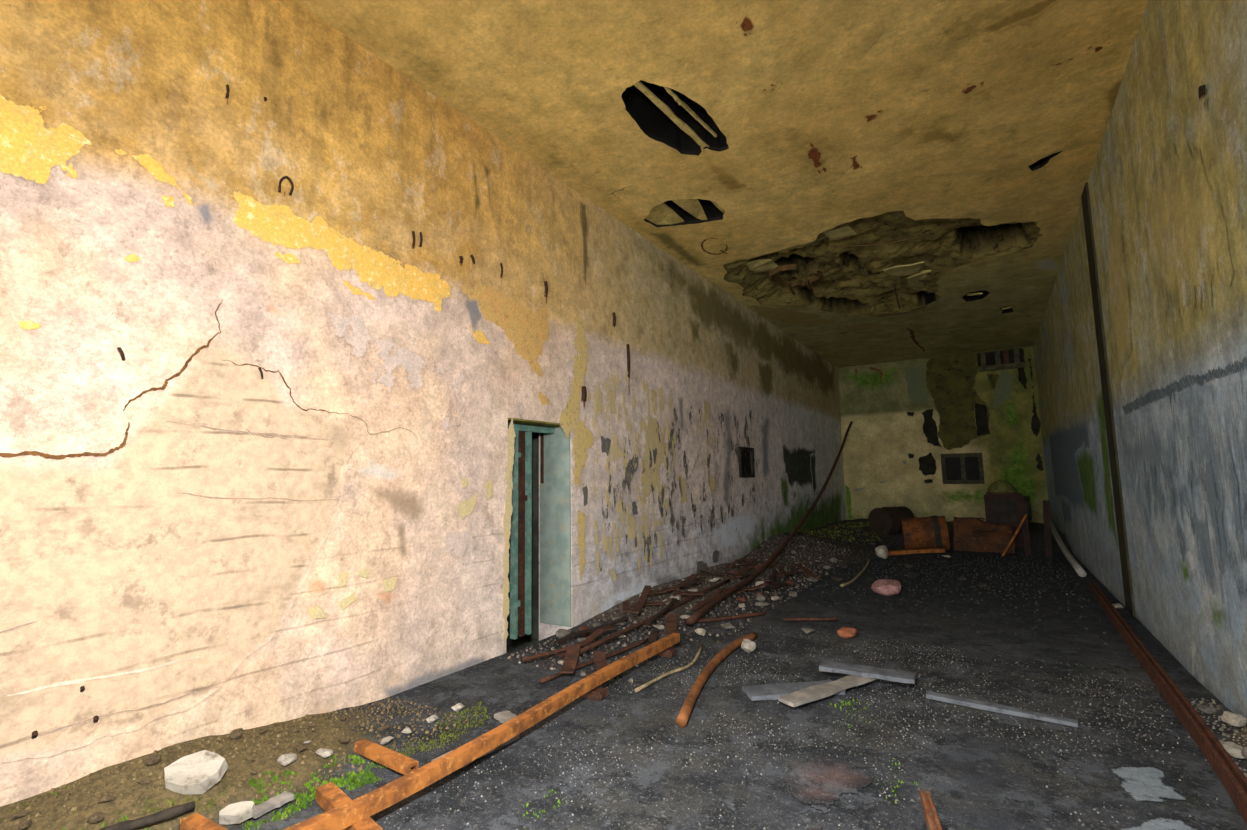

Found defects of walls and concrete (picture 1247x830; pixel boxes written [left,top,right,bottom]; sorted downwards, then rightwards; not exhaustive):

peeling [0,94,92,184]
peeling [115,148,216,228]
spalling [723,211,1042,319]
peeling [18,320,41,330]
crack [0,303,413,460]
peeling [230,188,772,595]
peeling [1122,355,1247,415]
crack [180,471,343,619]
flaking render [379,651,489,698]